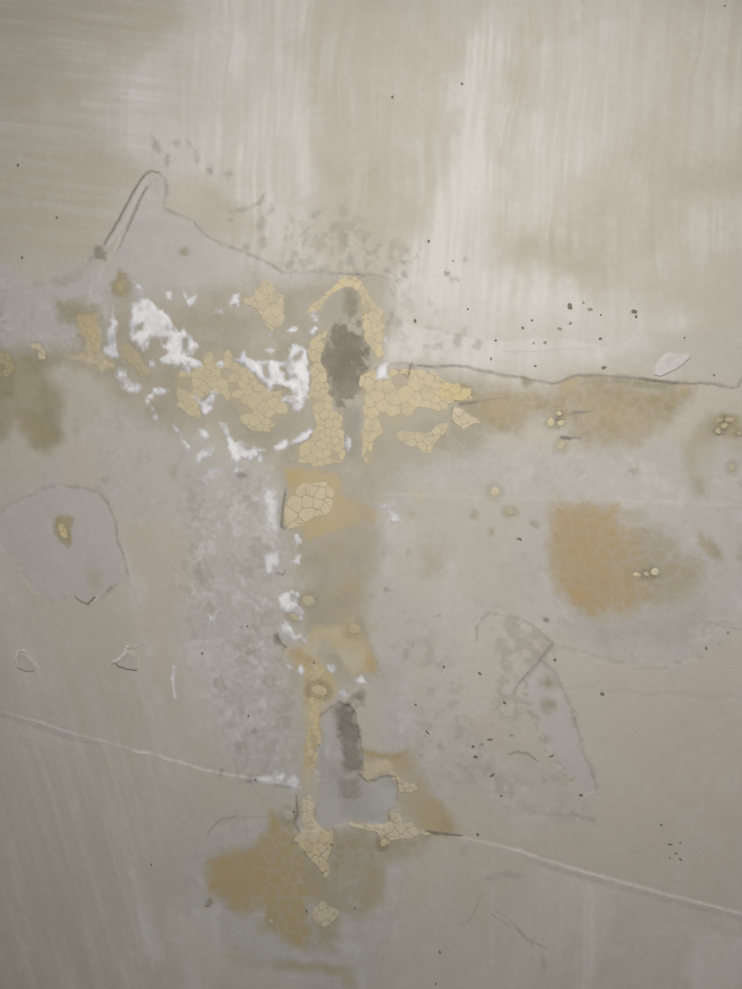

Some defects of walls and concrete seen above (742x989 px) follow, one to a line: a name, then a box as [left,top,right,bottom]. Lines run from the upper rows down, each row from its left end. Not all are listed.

peeling [240,276,289,334]
peeling [173,348,289,434]
peeling [282,326,347,531]
peeling [306,274,484,467]
crack [403,362,742,404]
leakage [0,204,503,792]
crack [0,708,300,833]
peeling [291,794,335,879]
peeling [349,808,434,846]
crack [423,829,742,936]